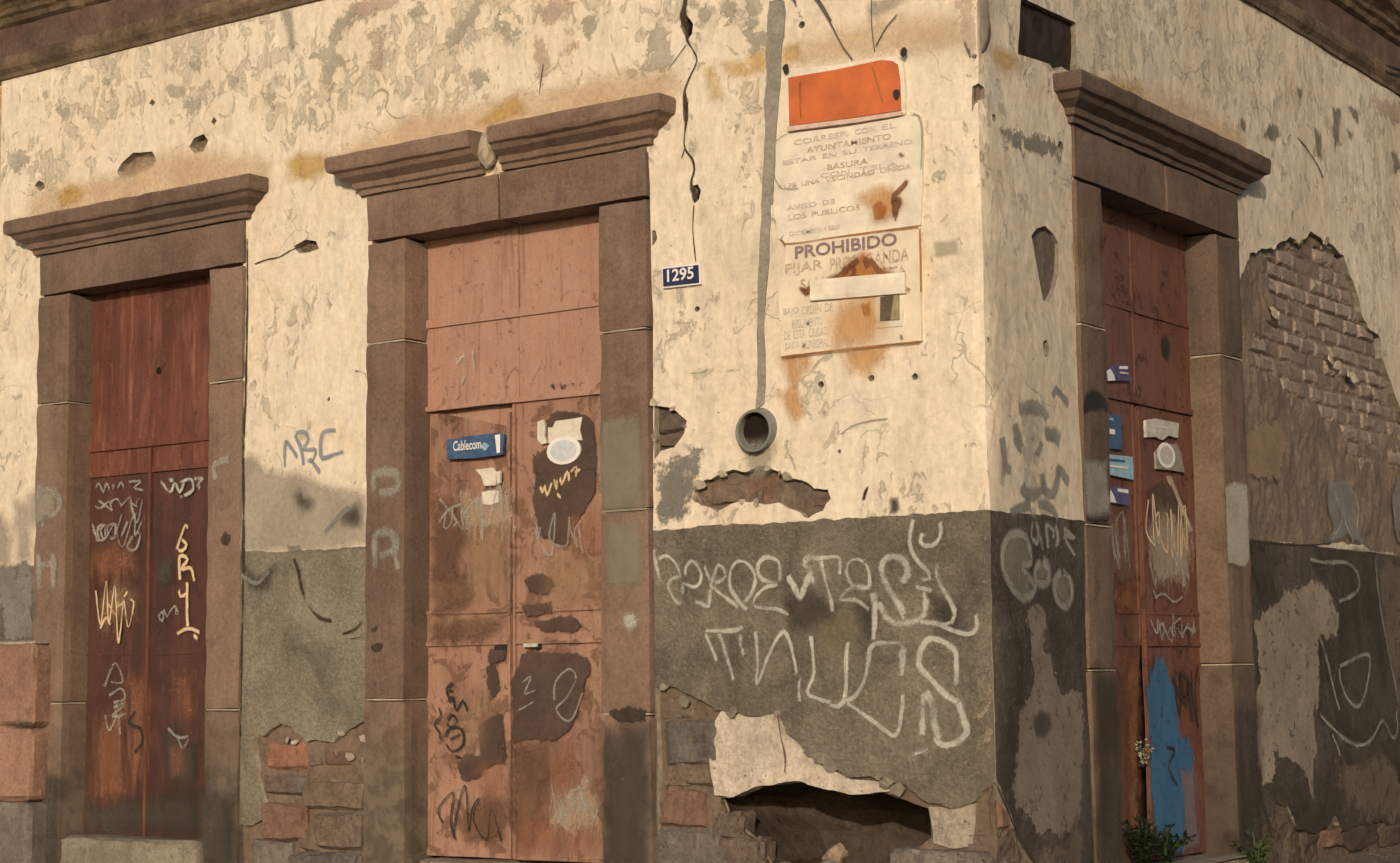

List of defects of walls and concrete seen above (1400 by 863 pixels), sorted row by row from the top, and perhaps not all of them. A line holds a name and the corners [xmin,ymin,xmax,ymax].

spalling [124,153,156,177]
crack [668,0,701,261]
rust [862,180,908,220]
rust [832,253,910,290]
rust [785,356,807,418]
rust [835,298,883,369]
flaking render [692,466,831,518]
flaking render [1240,235,1400,717]
flaking render [243,723,365,863]
flaking render [609,603,1086,863]
peeling [1254,578,1339,800]
flaking render [1262,743,1400,863]